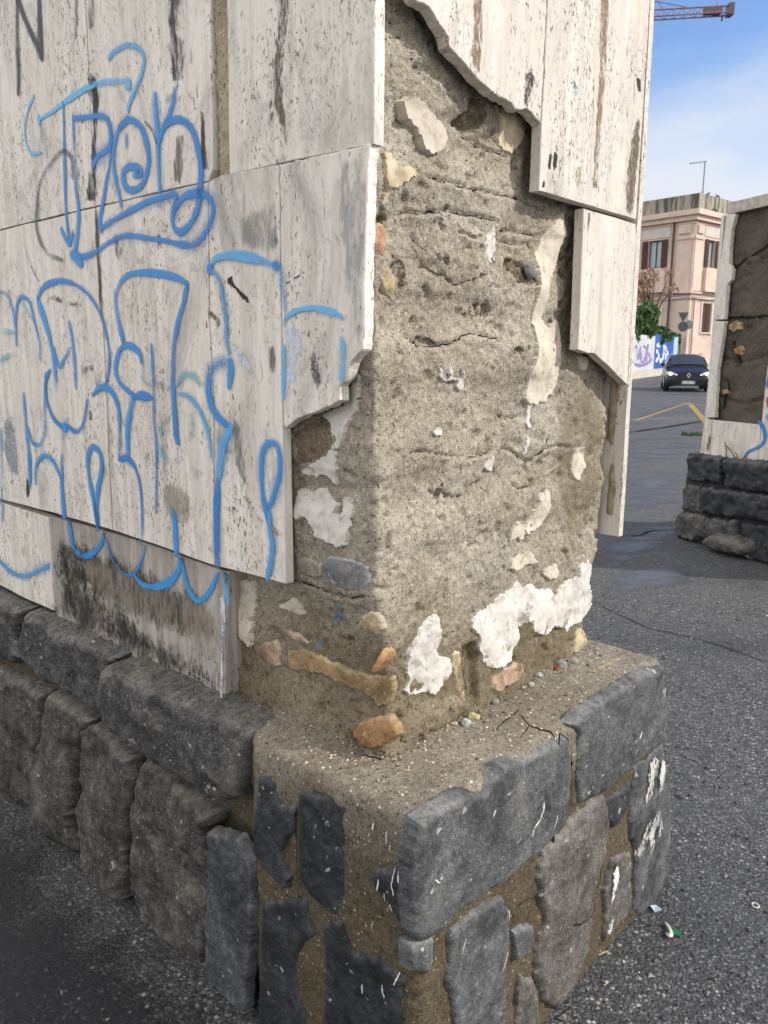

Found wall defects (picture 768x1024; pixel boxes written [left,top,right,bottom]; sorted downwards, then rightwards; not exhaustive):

peeling [395,95,526,156]
peeling [374,151,417,300]
crack [406,333,500,347]
spalling [462,302,490,318]
peeling [481,212,567,405]
flaking render [734,346,746,364]
spalling [729,251,768,332]
peeling [293,373,375,591]
crack [475,440,568,489]
peeling [568,447,586,482]
leakage [64,550,226,698]
peeling [257,489,592,748]